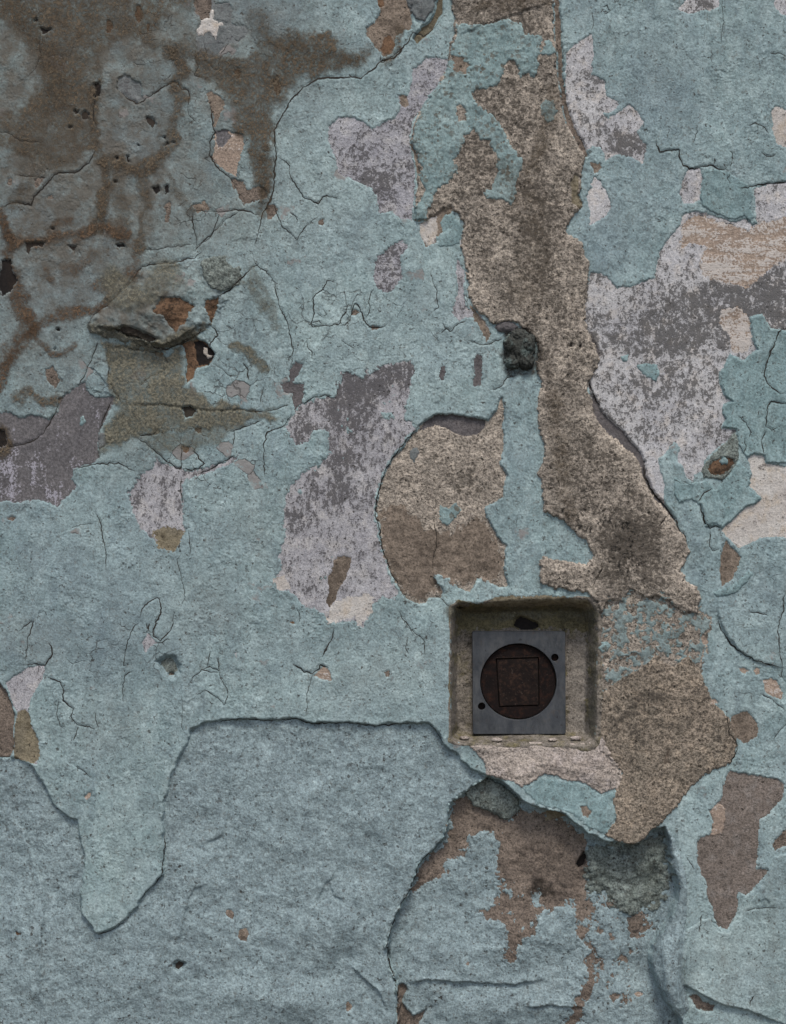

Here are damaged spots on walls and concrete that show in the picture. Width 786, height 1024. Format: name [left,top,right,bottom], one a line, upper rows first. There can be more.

crack [4,43,235,207]
leakage [0,0,370,254]
leakage [13,386,62,406]
peeling [0,359,115,507]
crack [19,612,98,740]
crack [122,528,191,693]
leakage [90,324,277,451]
crack [78,19,441,502]
peeling [273,360,508,628]
spalling [328,0,786,613]
spalling [0,588,758,1024]
peeling [683,771,786,1024]